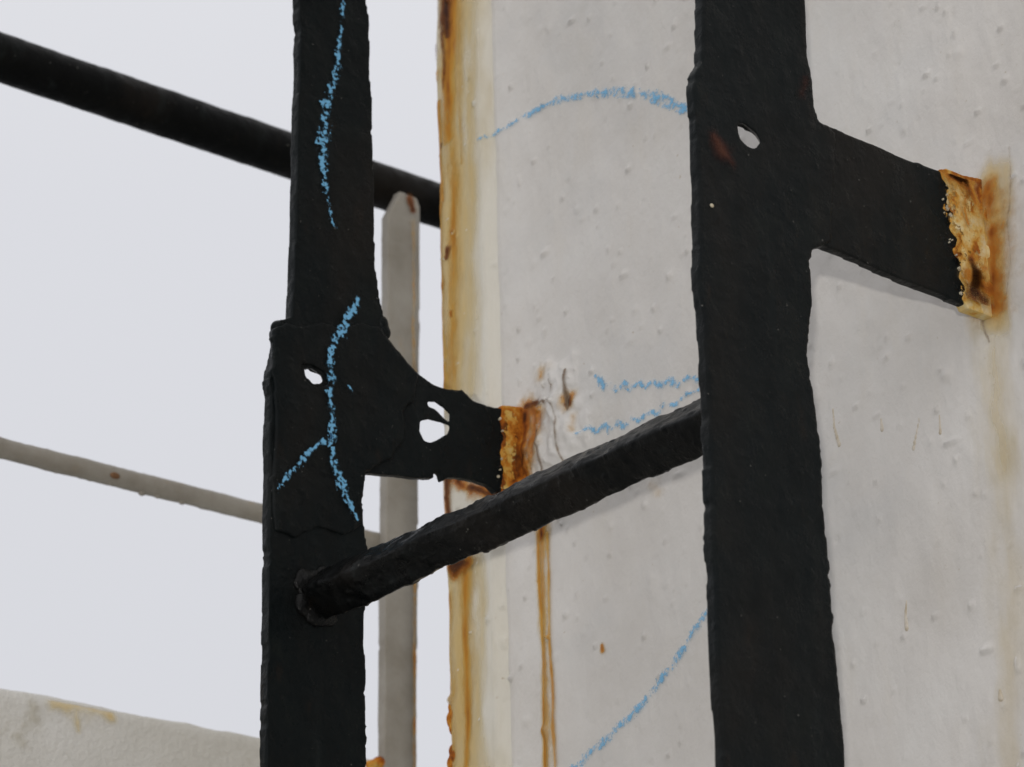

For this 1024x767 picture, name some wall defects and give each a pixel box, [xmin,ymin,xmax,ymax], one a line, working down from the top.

rust [435,0,462,390]
rust [938,169,1006,320]
rust [444,399,541,513]
rust [560,368,574,410]
rust [446,556,473,767]
rust [536,526,556,767]